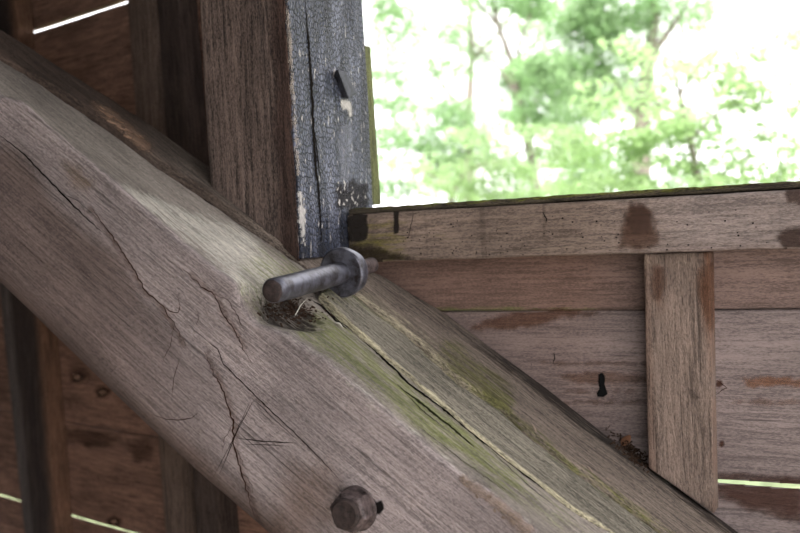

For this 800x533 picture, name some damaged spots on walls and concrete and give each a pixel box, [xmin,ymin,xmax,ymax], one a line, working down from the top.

crack [305,0,322,242]
peeling [336,180,369,209]
peeling [297,192,306,246]
water stain [620,205,658,249]
water stain [778,229,800,249]
crack [1,136,343,521]
water stain [473,310,578,329]